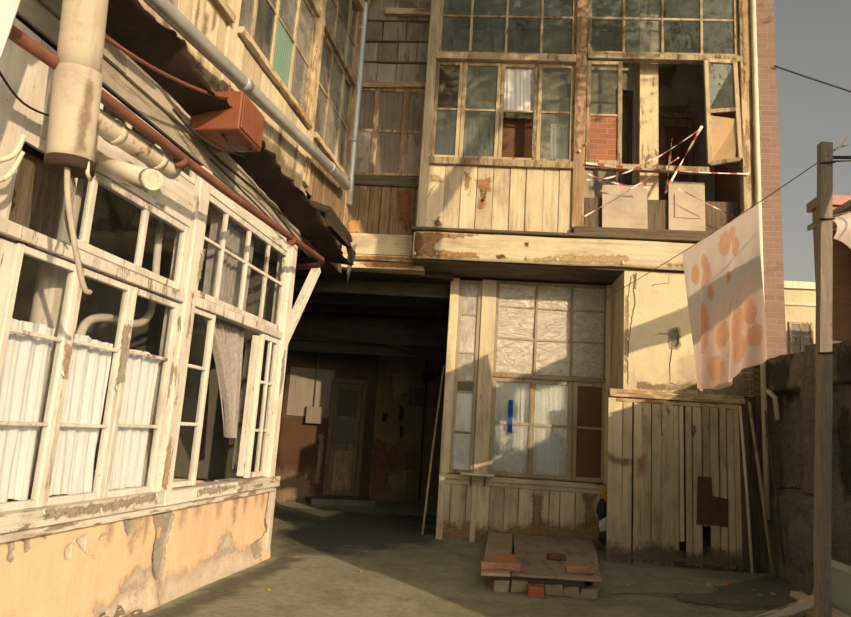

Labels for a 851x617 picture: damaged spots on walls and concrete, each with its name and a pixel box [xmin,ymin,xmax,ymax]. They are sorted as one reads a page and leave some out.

peeling [525,254,628,264]
peeling [115,323,133,390]
crack [626,275,665,383]
peeling [43,434,173,520]
spalling [6,538,31,562]
spalling [151,511,175,585]
spalling [251,540,262,559]
spalling [99,605,143,617]